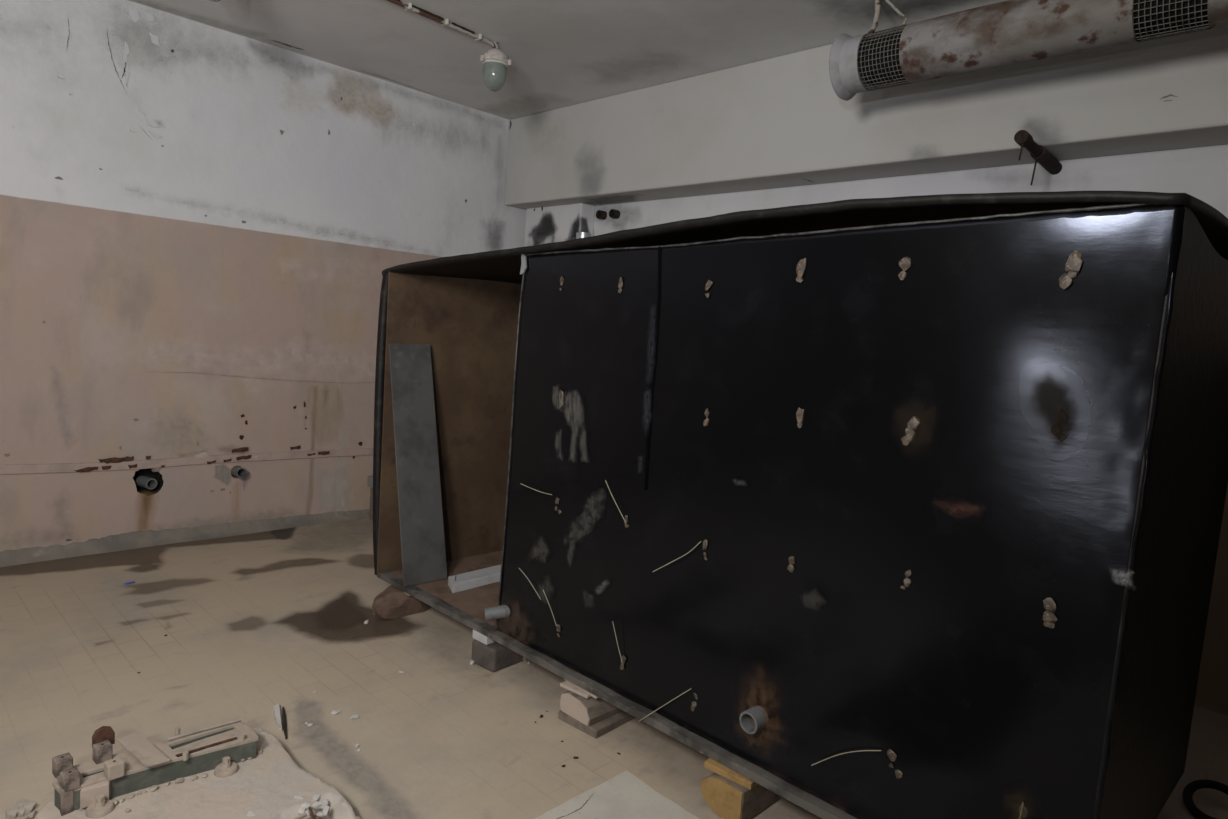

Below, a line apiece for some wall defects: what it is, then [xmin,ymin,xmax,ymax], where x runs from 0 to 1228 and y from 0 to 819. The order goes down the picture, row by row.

rust [397,0,475,34]
damp [531,214,555,245]
damp [569,217,579,240]
rust [74,456,165,472]